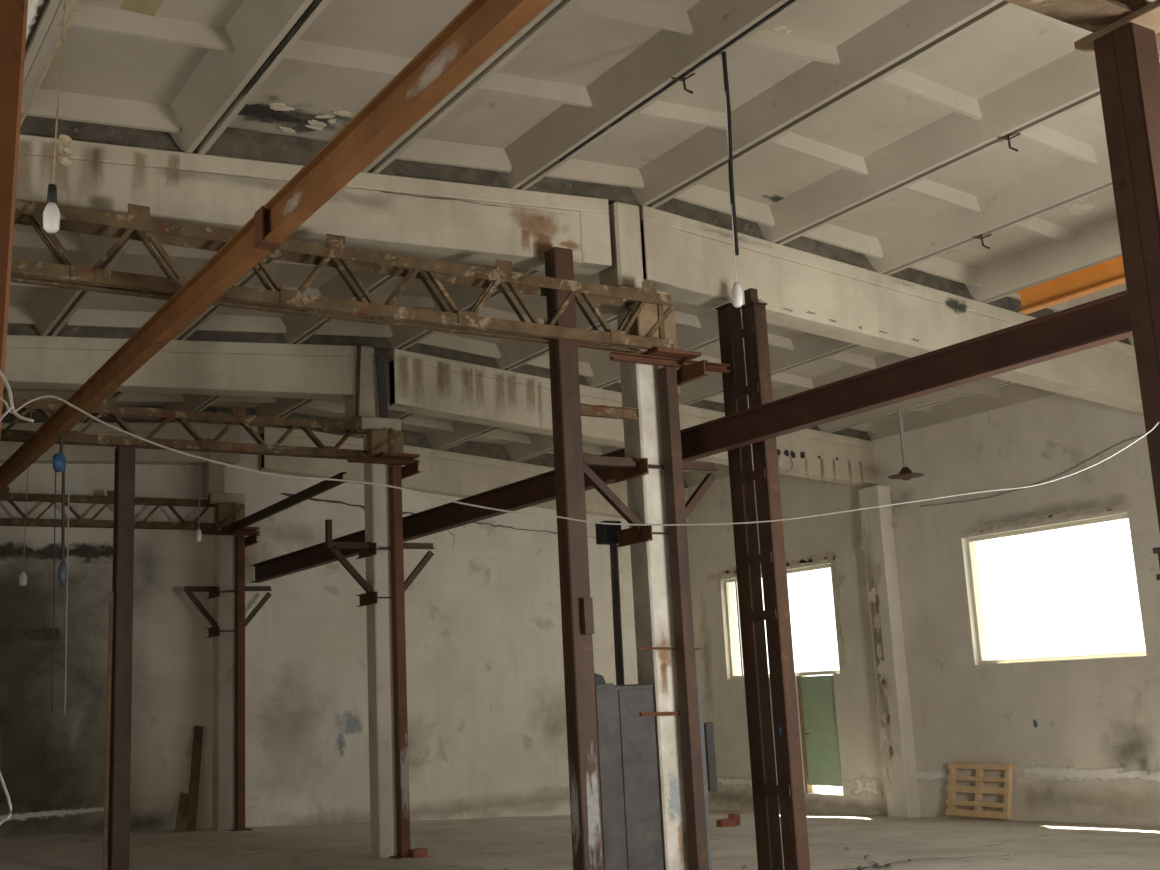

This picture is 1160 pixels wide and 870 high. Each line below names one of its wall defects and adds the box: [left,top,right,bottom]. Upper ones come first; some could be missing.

corrosion [521,213,578,257]
leakage [0,564,104,836]
flaking render [853,497,893,798]